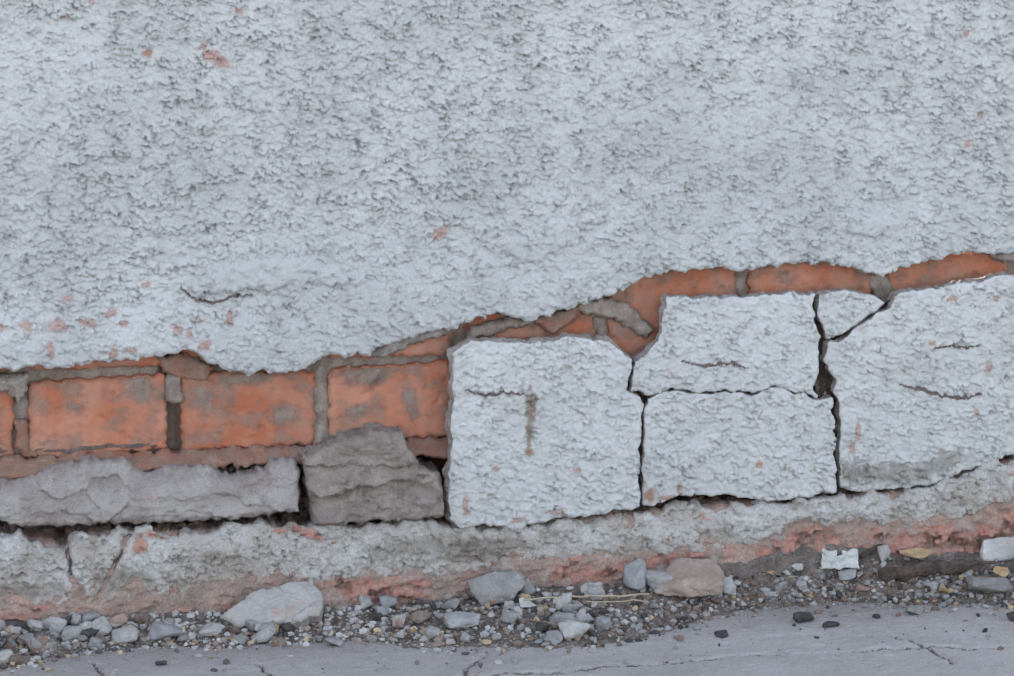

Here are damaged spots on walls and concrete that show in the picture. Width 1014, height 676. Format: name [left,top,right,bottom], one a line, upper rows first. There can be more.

spalling [960,251,1014,263]
spalling [822,261,904,306]
spalling [348,296,655,388]
spalling [0,371,30,404]
spalling [125,352,271,411]
crack [807,295,889,496]
corrosion [526,395,538,448]
crack [627,358,751,512]
peeling [133,530,168,553]
peeling [757,523,840,557]
peeling [852,510,1014,556]
peeling [330,577,429,605]